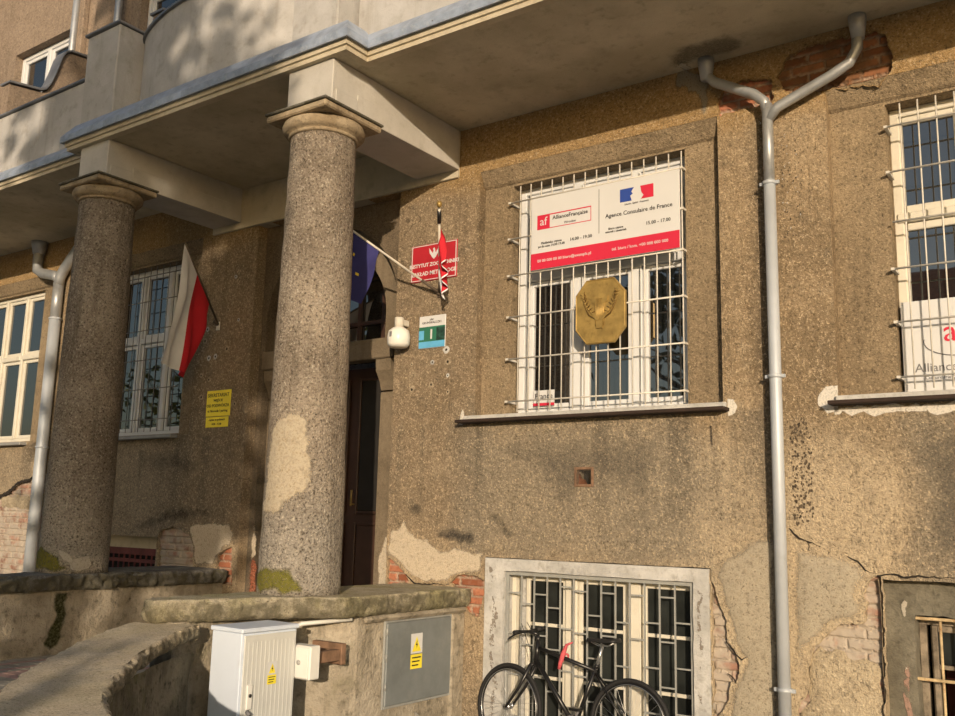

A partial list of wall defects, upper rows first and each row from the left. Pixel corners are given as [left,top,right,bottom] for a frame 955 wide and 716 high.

spalling [716,29,894,118]
peeling [263,414,311,513]
spalling [0,481,32,574]
spalling [35,472,47,572]
peeling [156,523,233,586]
crack [789,528,821,550]
crack [847,556,954,579]
damp [44,593,67,649]
peeling [378,521,498,714]
spalling [697,569,740,716]
spalling [796,574,889,716]
peeling [903,667,913,716]